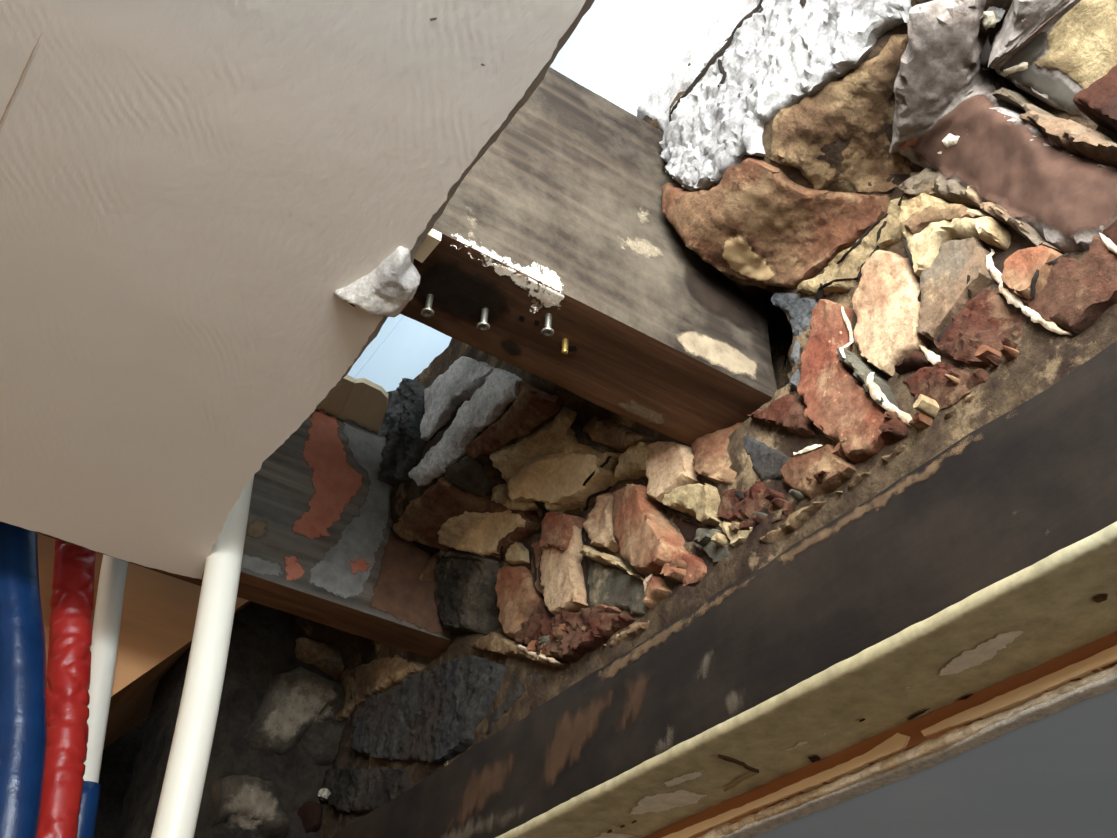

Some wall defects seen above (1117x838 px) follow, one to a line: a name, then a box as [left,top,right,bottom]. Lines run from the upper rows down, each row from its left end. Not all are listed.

crack [0,33,42,124]
crack [669,0,763,119]
flaking render [334,246,421,317]
damp [417,234,565,323]
spalling [660,558,687,583]
peeling [939,630,1023,676]
peeling [630,771,707,815]
flaking render [697,664,1117,838]